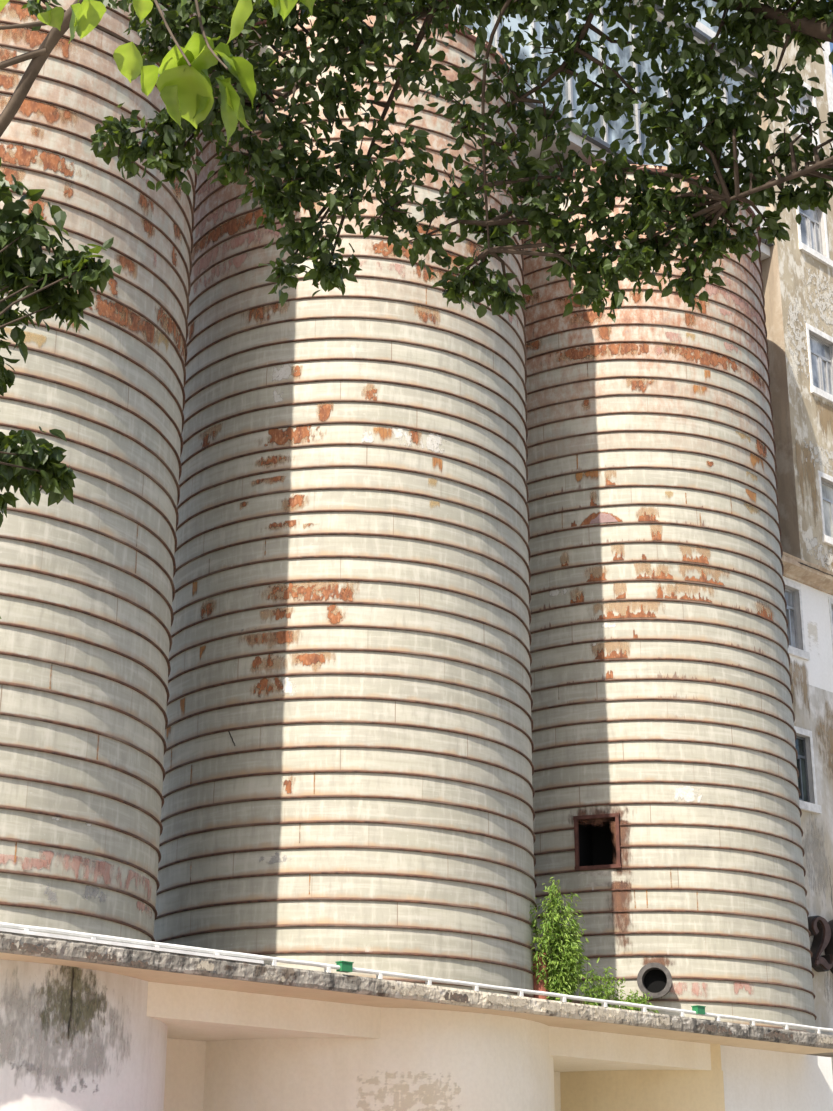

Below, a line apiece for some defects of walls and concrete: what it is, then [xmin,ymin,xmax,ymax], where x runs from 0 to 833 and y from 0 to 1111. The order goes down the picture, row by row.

peeling [392,428,444,453]
peeling [282,676,296,695]
corrosion [572,808,648,946]